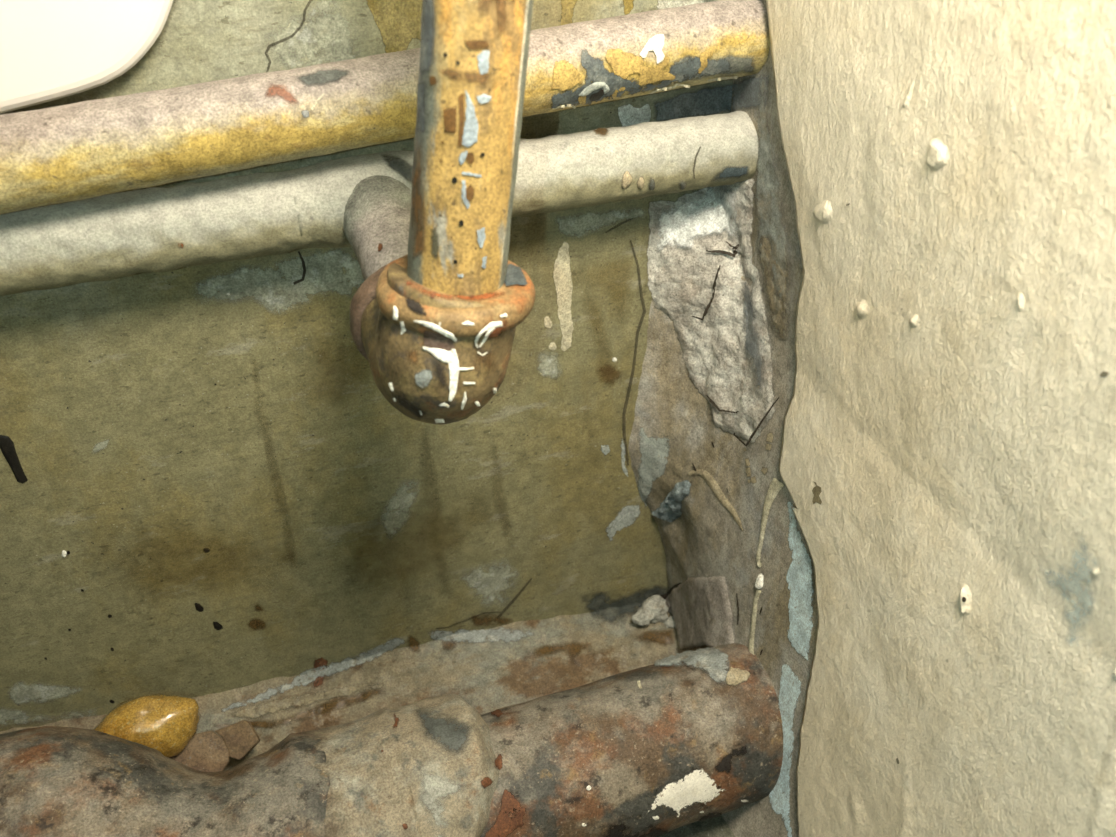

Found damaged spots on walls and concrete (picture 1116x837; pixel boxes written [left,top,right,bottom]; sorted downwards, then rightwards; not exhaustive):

crack [265,0,313,72]
flaking render [657,0,716,10]
spalling [551,48,788,446]